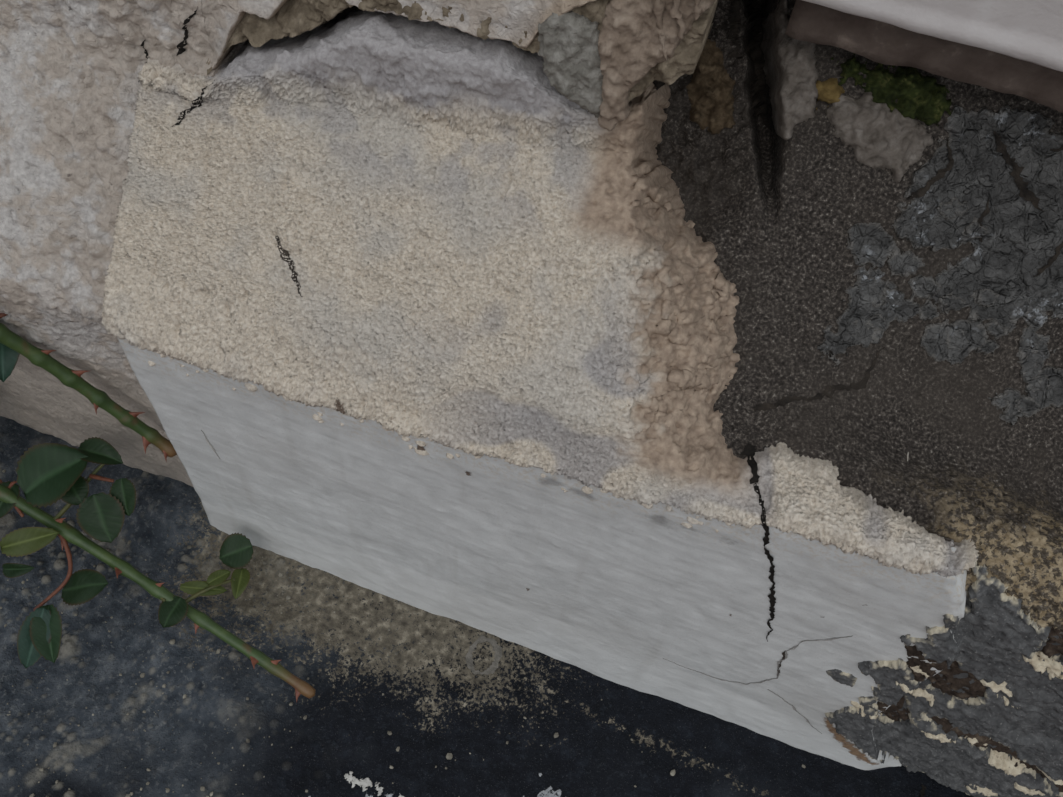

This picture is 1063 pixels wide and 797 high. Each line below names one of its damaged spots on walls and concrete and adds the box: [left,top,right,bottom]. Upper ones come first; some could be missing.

crack [176,6,198,56]
crack [171,80,215,127]
spalling [206,0,464,75]
crack [333,5,359,19]
spalling [477,17,492,40]
spalling [512,0,611,118]
crack [652,80,665,90]
peeling [810,92,1063,426]
crack [663,444,852,734]
peeling [825,554,1063,797]